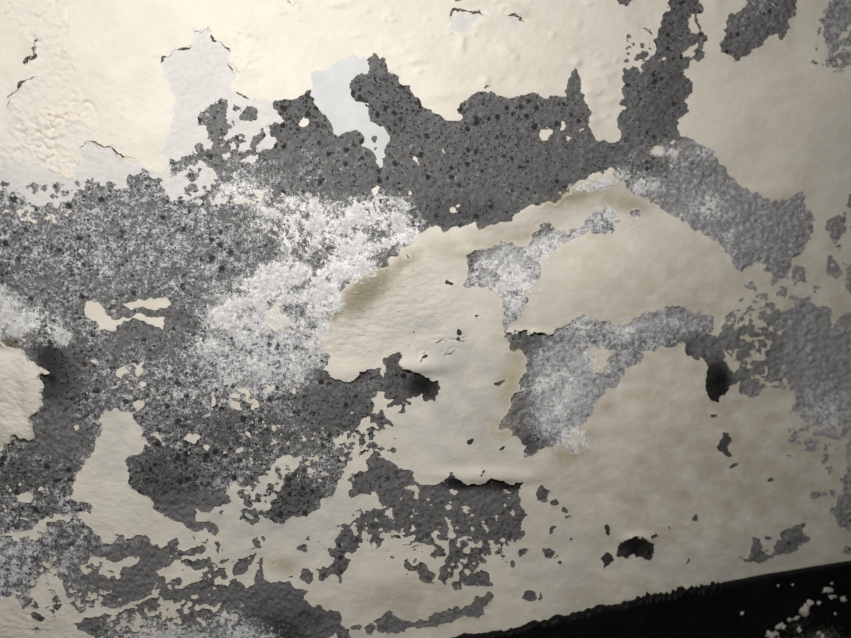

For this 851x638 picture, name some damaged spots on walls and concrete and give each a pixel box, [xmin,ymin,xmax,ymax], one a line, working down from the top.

crack [7,39,37,106]
crack [161,27,249,100]
peeling [811,0,851,73]
crack [78,140,135,159]
peeling [0,0,815,301]
peeling [825,194,851,294]
peeling [0,98,528,638]
peeling [463,207,714,458]
peeling [716,281,851,536]
peeling [536,485,571,518]
peeling [601,533,661,570]
peeling [739,522,810,564]